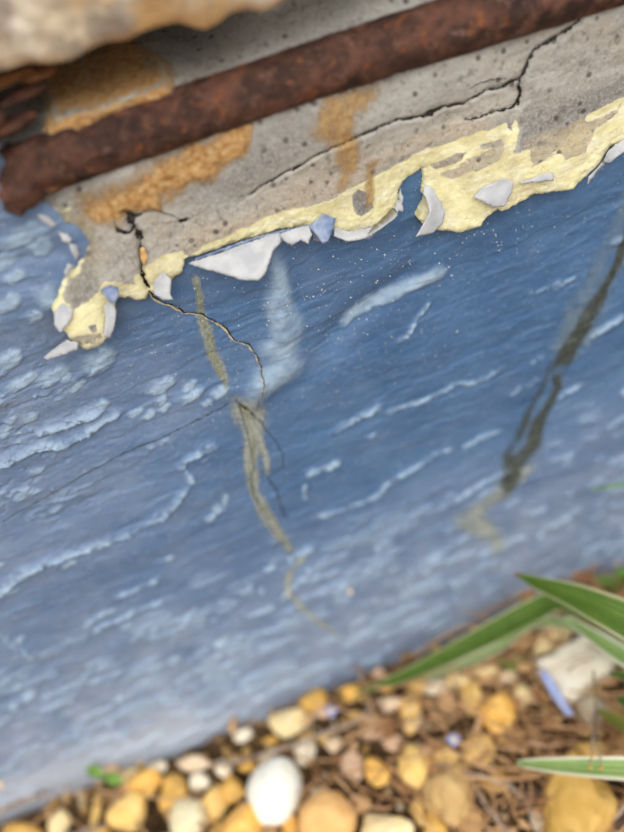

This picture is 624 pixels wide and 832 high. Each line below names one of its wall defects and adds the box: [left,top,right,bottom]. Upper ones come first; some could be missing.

corrosion [0,0,624,223]
spalling [0,0,624,360]
crack [251,19,580,195]
crack [3,210,295,560]
leakage [193,276,227,382]
leakage [232,401,294,553]
leakage [457,233,624,555]